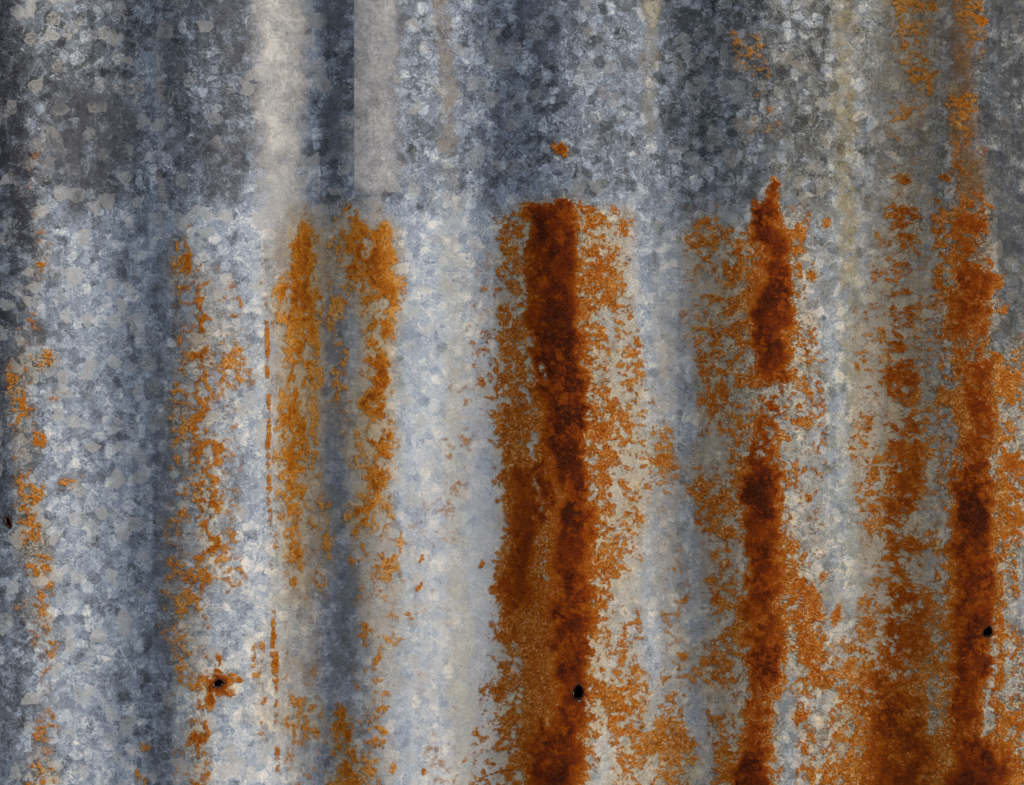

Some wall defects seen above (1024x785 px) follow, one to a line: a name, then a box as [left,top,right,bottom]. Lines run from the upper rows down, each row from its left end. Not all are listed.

corrosion [6,349,54,448]
corrosion [13,455,61,682]
corrosion [160,204,423,785]
corrosion [458,0,1024,785]
corrosion [26,708,59,785]